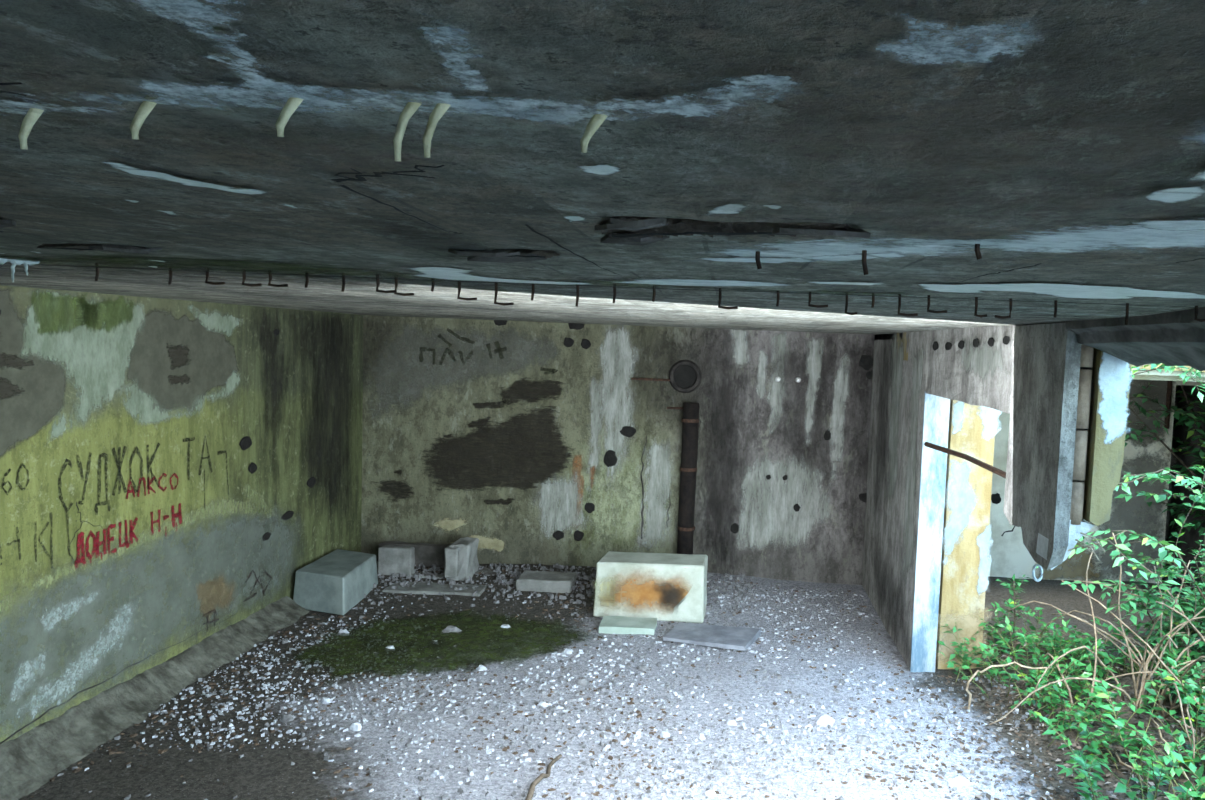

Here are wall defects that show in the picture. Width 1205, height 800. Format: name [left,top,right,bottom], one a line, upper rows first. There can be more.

crack [0,82,27,96]
damp [0,0,798,124]
damp [876,14,1037,64]
damp [1147,174,1205,203]
spalling [595,216,871,275]
damp [704,220,1205,263]
peeling [0,289,67,458]
peeling [127,306,239,412]
damp [539,327,635,536]
damp [638,443,671,546]